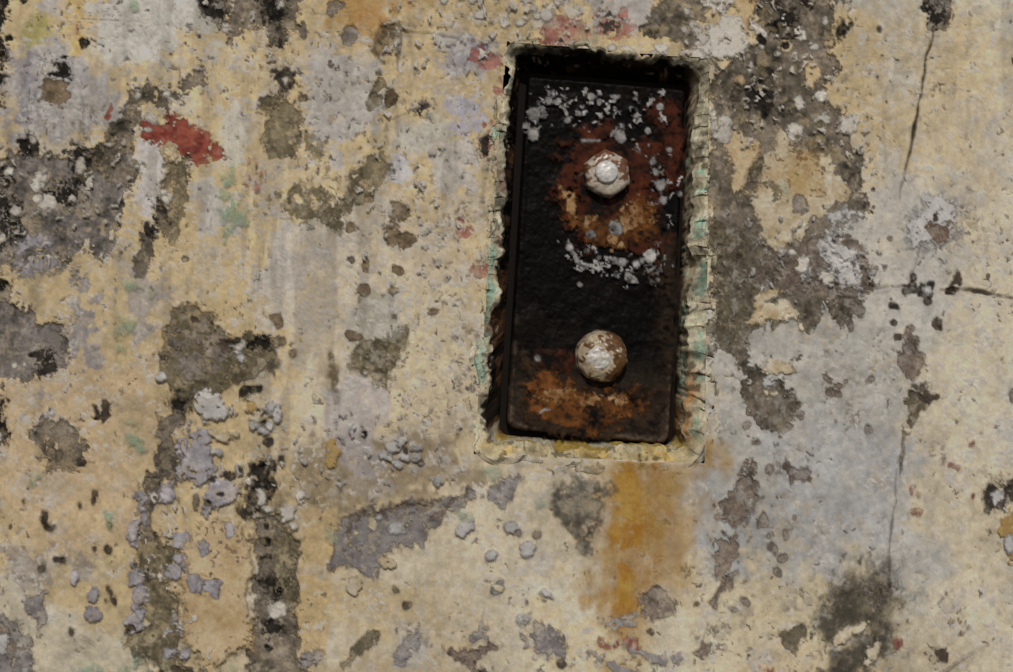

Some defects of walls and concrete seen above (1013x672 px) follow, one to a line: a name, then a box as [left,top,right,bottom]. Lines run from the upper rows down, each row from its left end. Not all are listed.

crack [902,40,932,183]
corrosion [543,96,689,374]
crack [866,272,1013,299]
spalling [93,400,111,423]
corrosion [518,349,670,441]
spalling [40,510,56,531]
peeling [122,301,297,672]
peeling [245,488,325,672]
peeling [340,630,380,670]
peeling [301,412,524,596]
peeling [516,612,569,659]
corrosion [600,462,660,631]